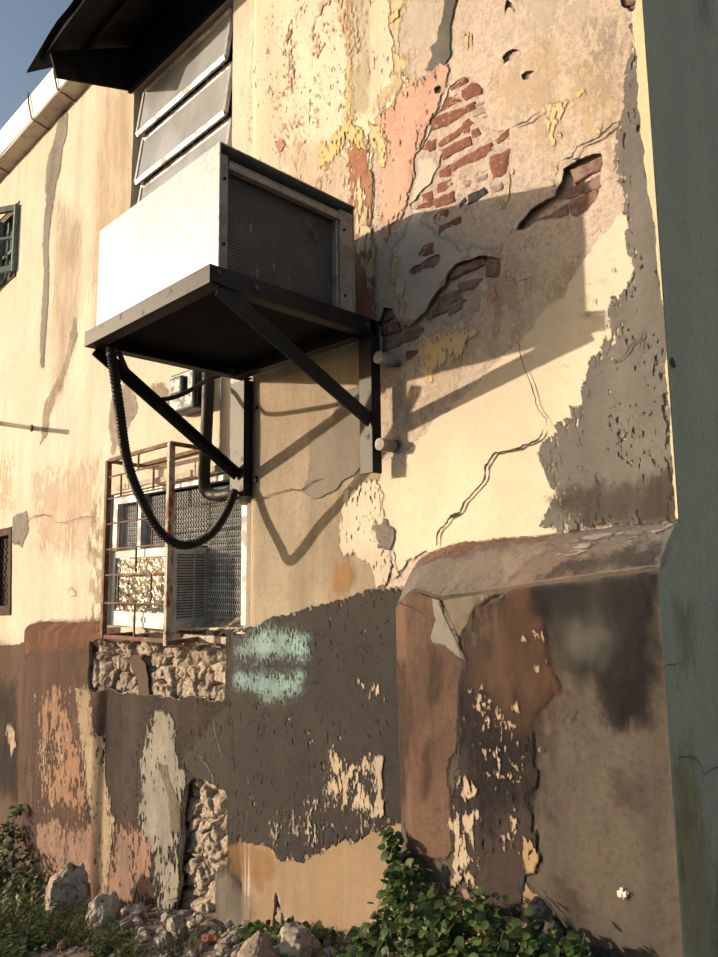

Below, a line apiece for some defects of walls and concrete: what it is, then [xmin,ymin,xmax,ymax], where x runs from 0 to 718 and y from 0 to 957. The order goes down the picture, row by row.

spalling [621,0,636,12]
spalling [262,0,513,367]
spalling [518,154,603,230]
crack [436,342,547,545]
peeling [337,478,400,588]
rust [24,619,111,656]
spalling [32,620,241,822]
peeling [468,684,524,793]
spalling [179,778,228,913]
peeling [268,744,386,853]
peeling [439,775,483,890]
peeling [500,809,539,874]